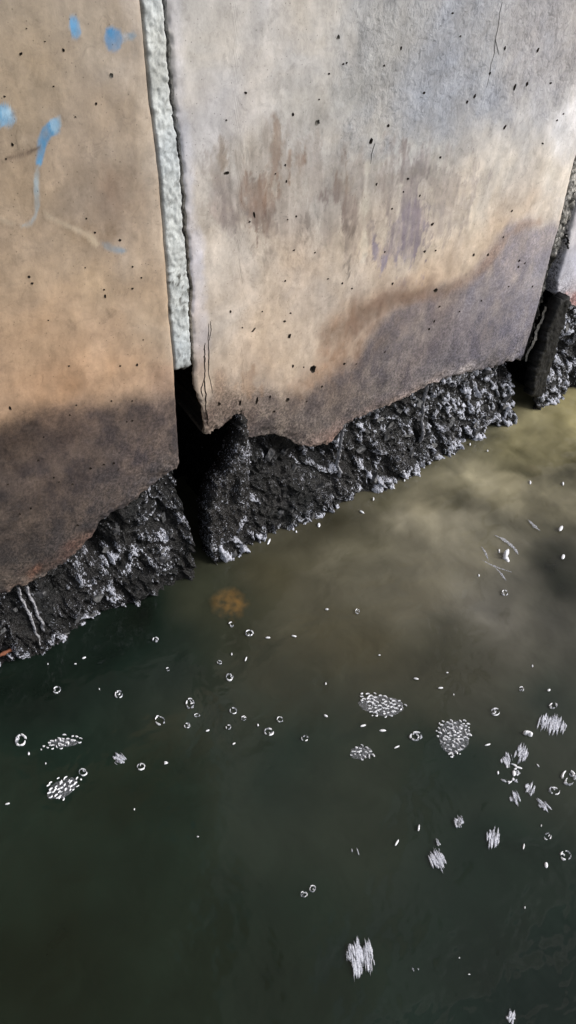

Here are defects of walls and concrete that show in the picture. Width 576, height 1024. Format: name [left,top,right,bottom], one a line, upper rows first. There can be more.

leakage [0,358,179,593]
crack [201,321,213,424]
spalling [0,290,554,667]
leakage [183,108,561,444]
spalling [532,304,576,410]